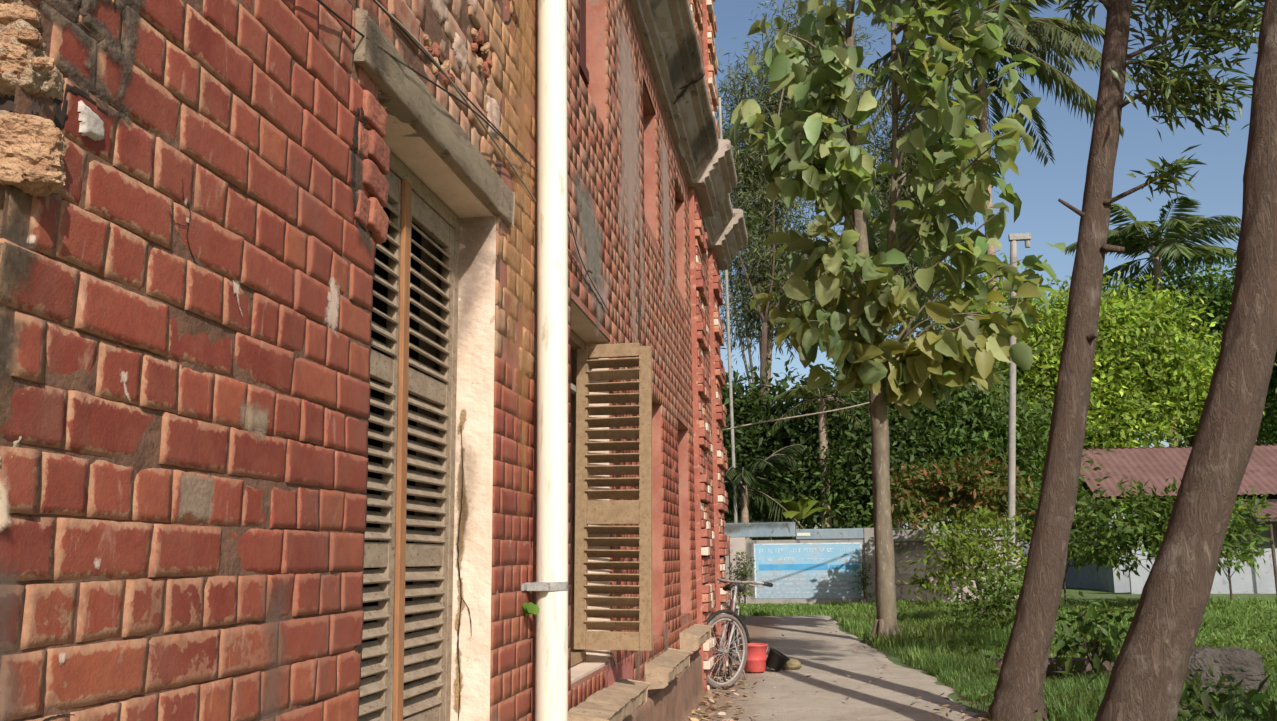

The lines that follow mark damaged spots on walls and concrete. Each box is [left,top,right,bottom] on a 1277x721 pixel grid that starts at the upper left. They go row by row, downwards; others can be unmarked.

spalling [0,0,55,77]
peeling [423,0,493,86]
spalling [0,112,69,197]
peeling [485,94,500,140]
flaking render [0,483,10,529]
crack [457,430,472,720]